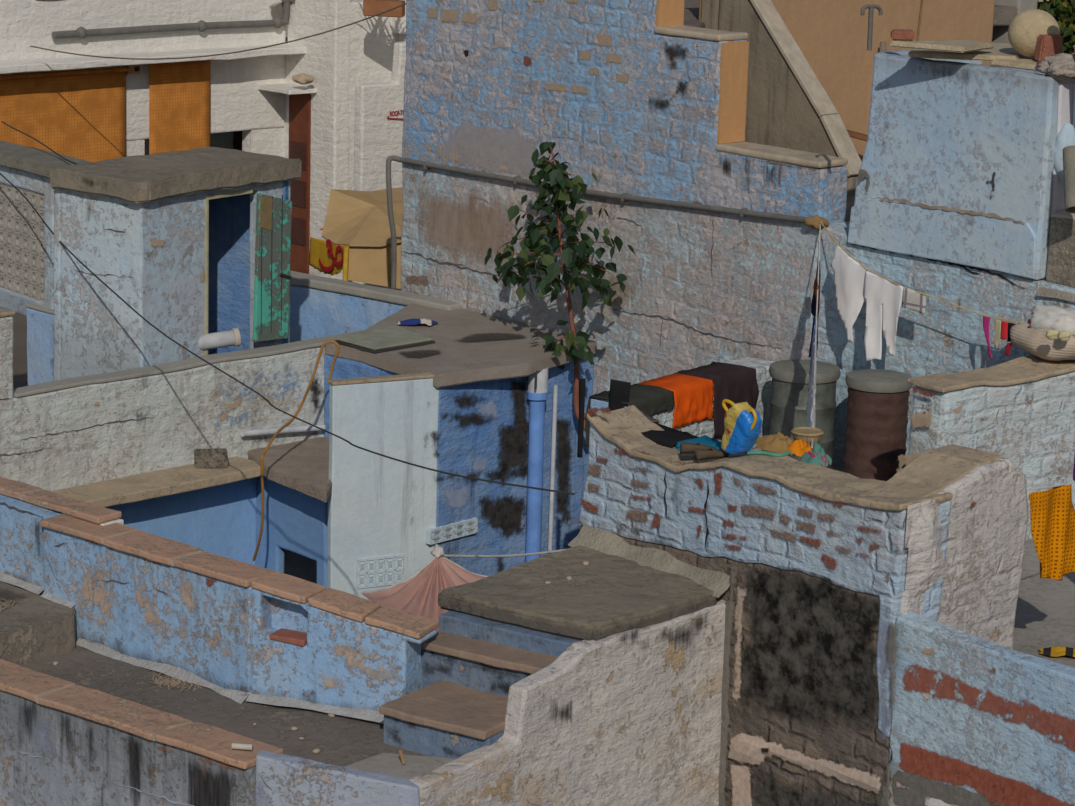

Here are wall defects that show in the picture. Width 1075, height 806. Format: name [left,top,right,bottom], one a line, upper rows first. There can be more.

flaking render [428,7,476,23]
flaking render [579,34,628,83]
leakage [443,381,529,537]
flaking render [568,448,660,528]
spalling [695,468,777,494]
flaking render [688,500,706,537]
flaking render [722,492,881,570]
peeling [76,569,119,625]
leakage [740,568,880,728]
leakage [189,763,230,806]
leakage [755,773,879,806]
flaking render [892,770,1008,806]